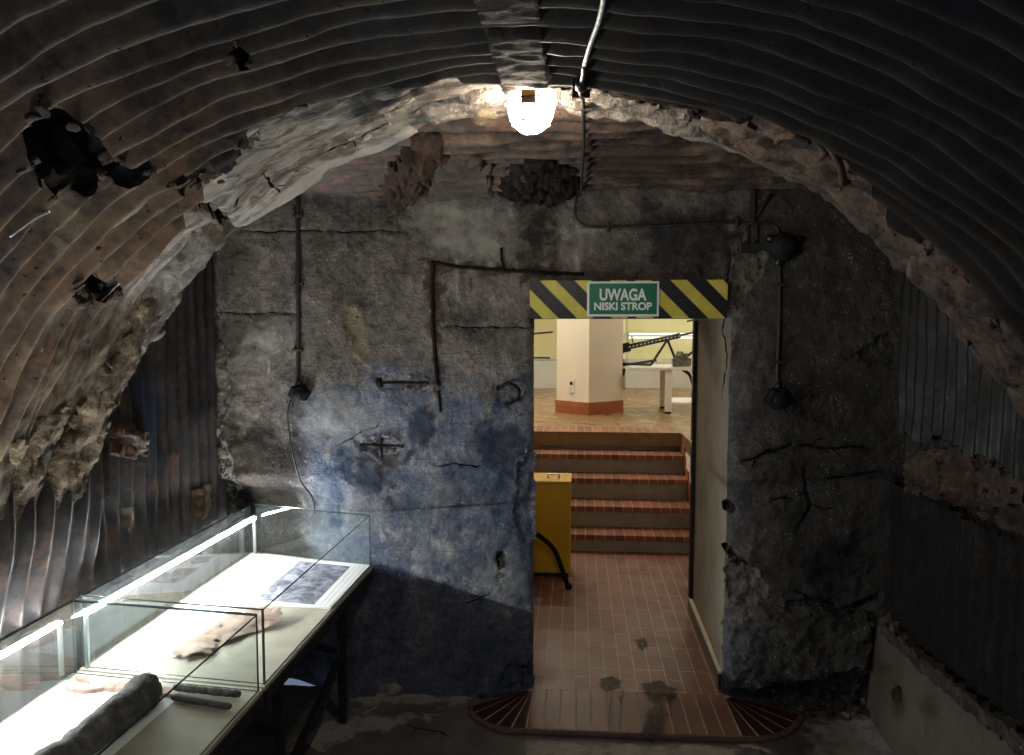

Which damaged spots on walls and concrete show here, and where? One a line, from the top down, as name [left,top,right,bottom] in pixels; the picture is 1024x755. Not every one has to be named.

spalling [561,90,718,143]
peeling [730,235,769,297]
spalling [9,87,509,521]
crack [745,438,883,528]
spalling [902,447,1024,511]
spalling [723,545,771,607]
water stain [600,676,624,729]
water stain [638,680,676,741]
spalling [880,620,1024,755]